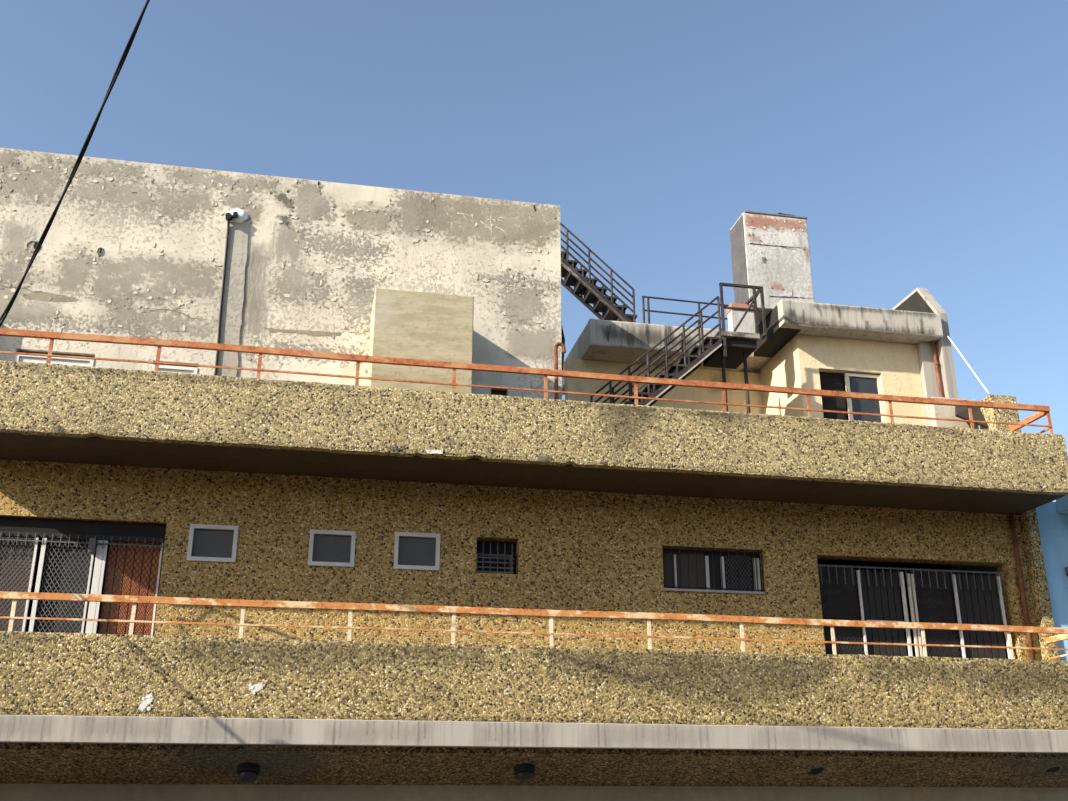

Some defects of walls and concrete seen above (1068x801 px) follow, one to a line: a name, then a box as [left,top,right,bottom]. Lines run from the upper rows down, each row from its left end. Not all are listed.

water stain [0,288,56,320]
water stain [86,293,217,339]
water stain [243,245,266,335]
water stain [509,331,553,359]
water stain [605,325,693,349]